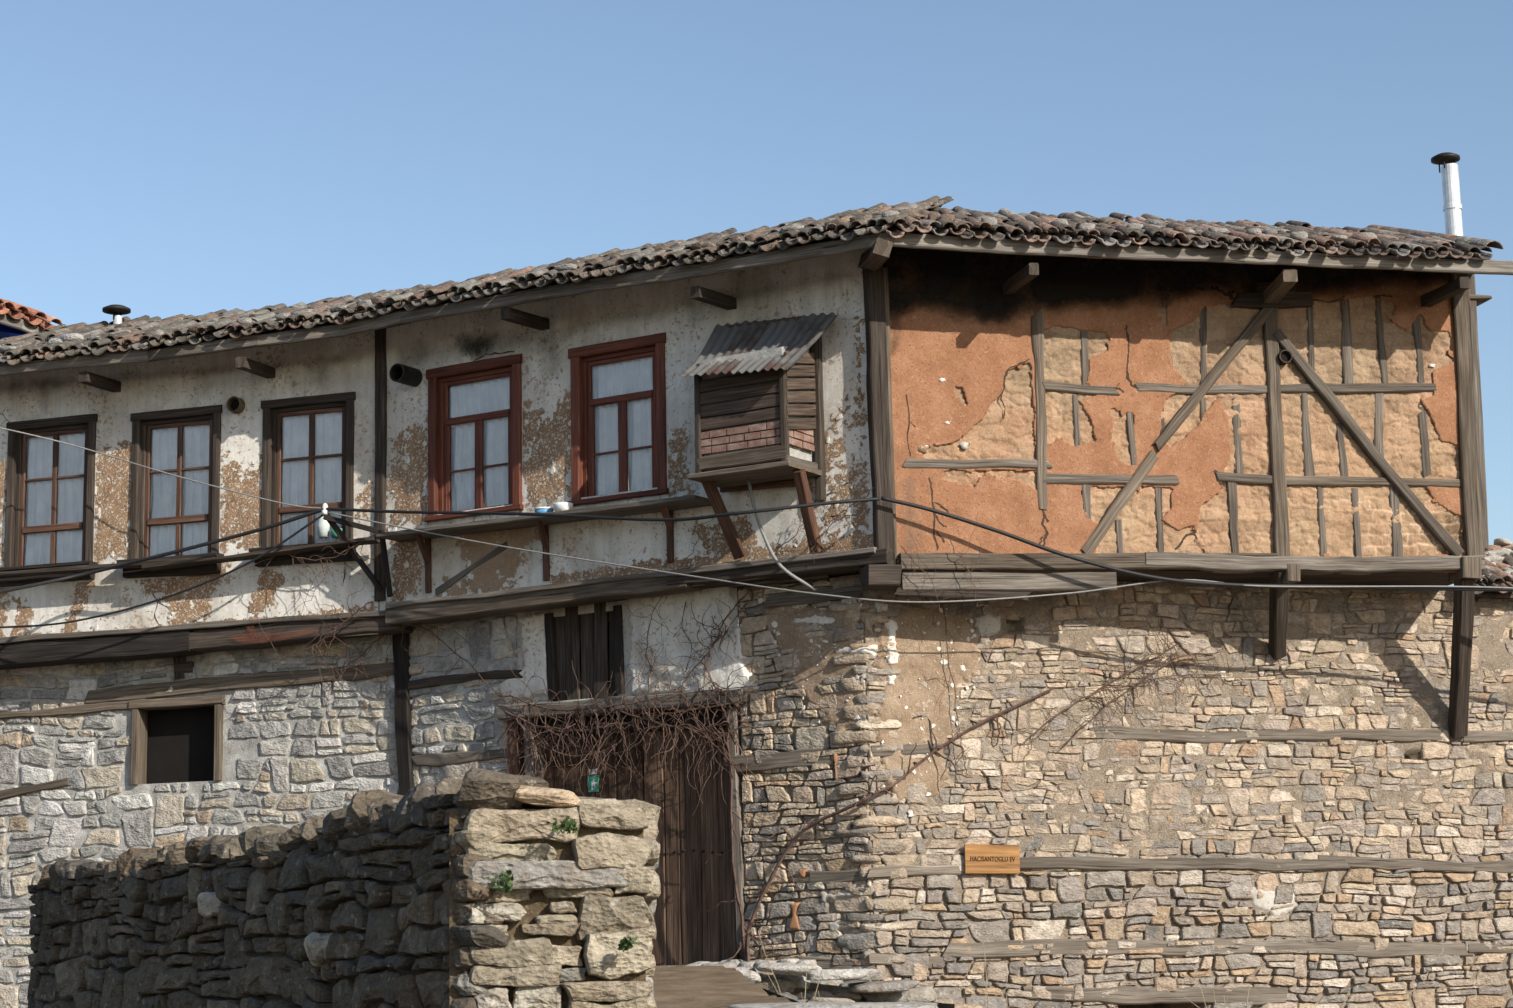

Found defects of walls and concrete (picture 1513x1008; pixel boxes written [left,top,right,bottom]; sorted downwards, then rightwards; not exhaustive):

peeling [0,316,874,638]
flaking render [918,326,1135,490]
flaking render [1091,295,1465,557]
flaking render [627,587,759,696]
flaking render [763,601,983,752]